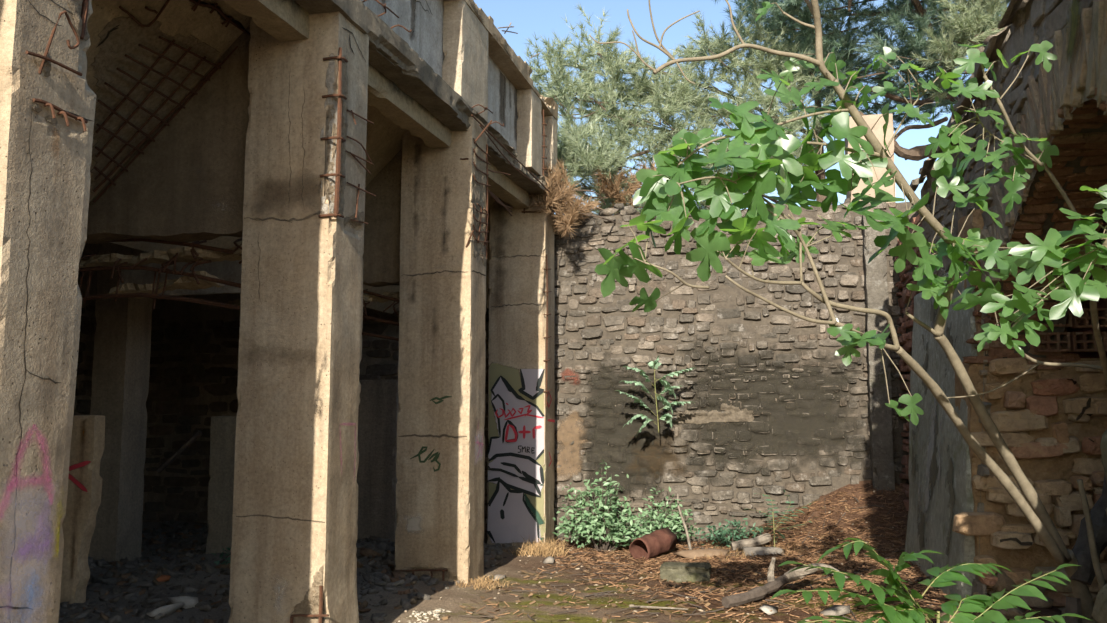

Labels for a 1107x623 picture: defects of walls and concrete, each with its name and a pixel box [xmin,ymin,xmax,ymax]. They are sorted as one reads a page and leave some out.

crack [0,99,92,623]
spalling [25,0,219,193]
spalling [78,238,242,310]
crack [247,75,330,298]
spalling [318,47,376,227]
spalling [290,566,329,623]
spalling [399,567,449,581]
spalling [398,608,452,623]